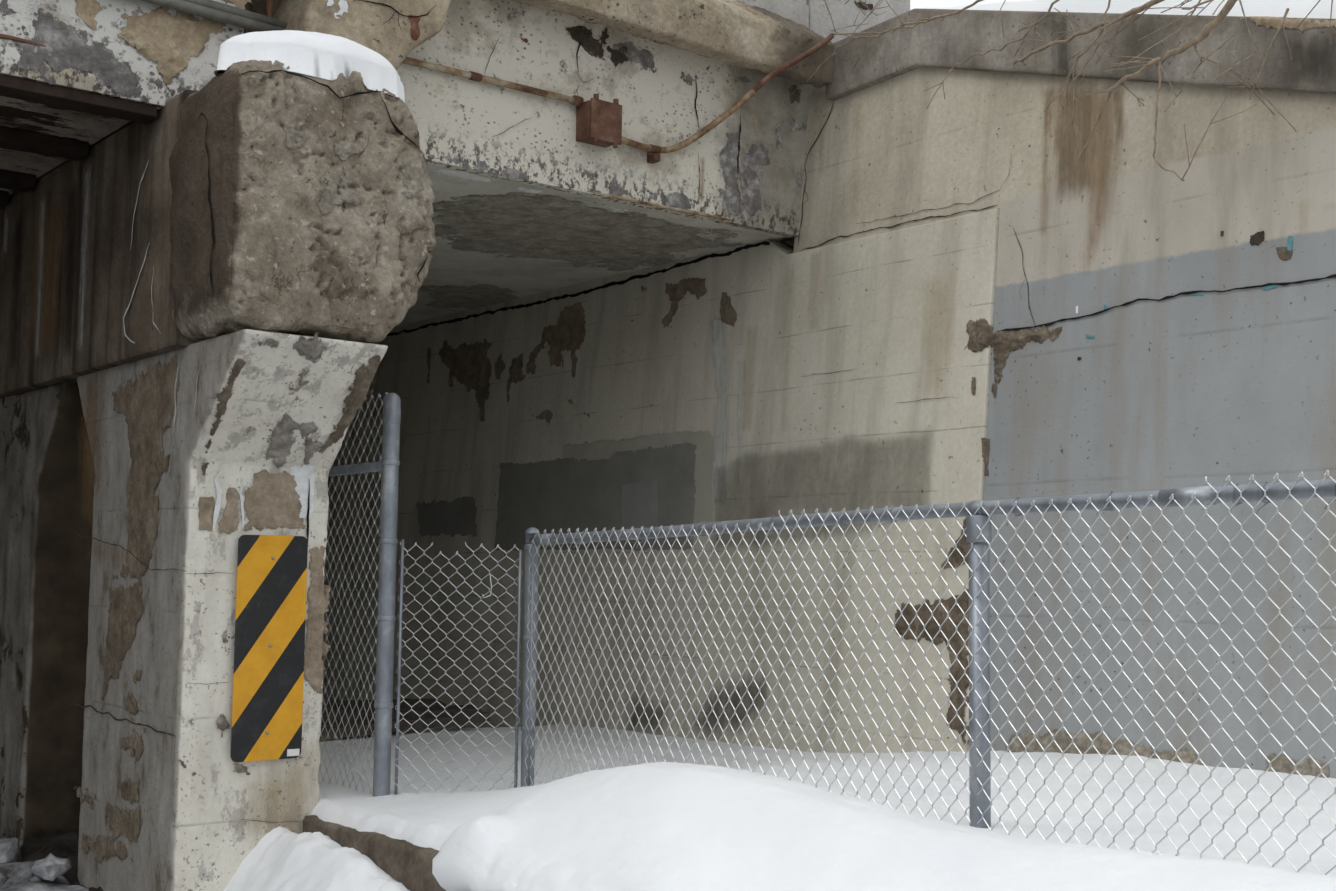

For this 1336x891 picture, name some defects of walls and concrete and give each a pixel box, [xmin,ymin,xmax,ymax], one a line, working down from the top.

peeling [0,0,226,98]
spalling [565,25,657,74]
crack [694,79,702,200]
crack [198,112,215,296]
crack [386,100,1336,338]
spalling [258,333,327,401]
peeling [427,301,587,424]
spalling [966,318,1062,398]
peeling [198,355,381,534]
peeling [100,353,179,763]
spalling [941,518,969,569]
spalling [894,588,969,745]